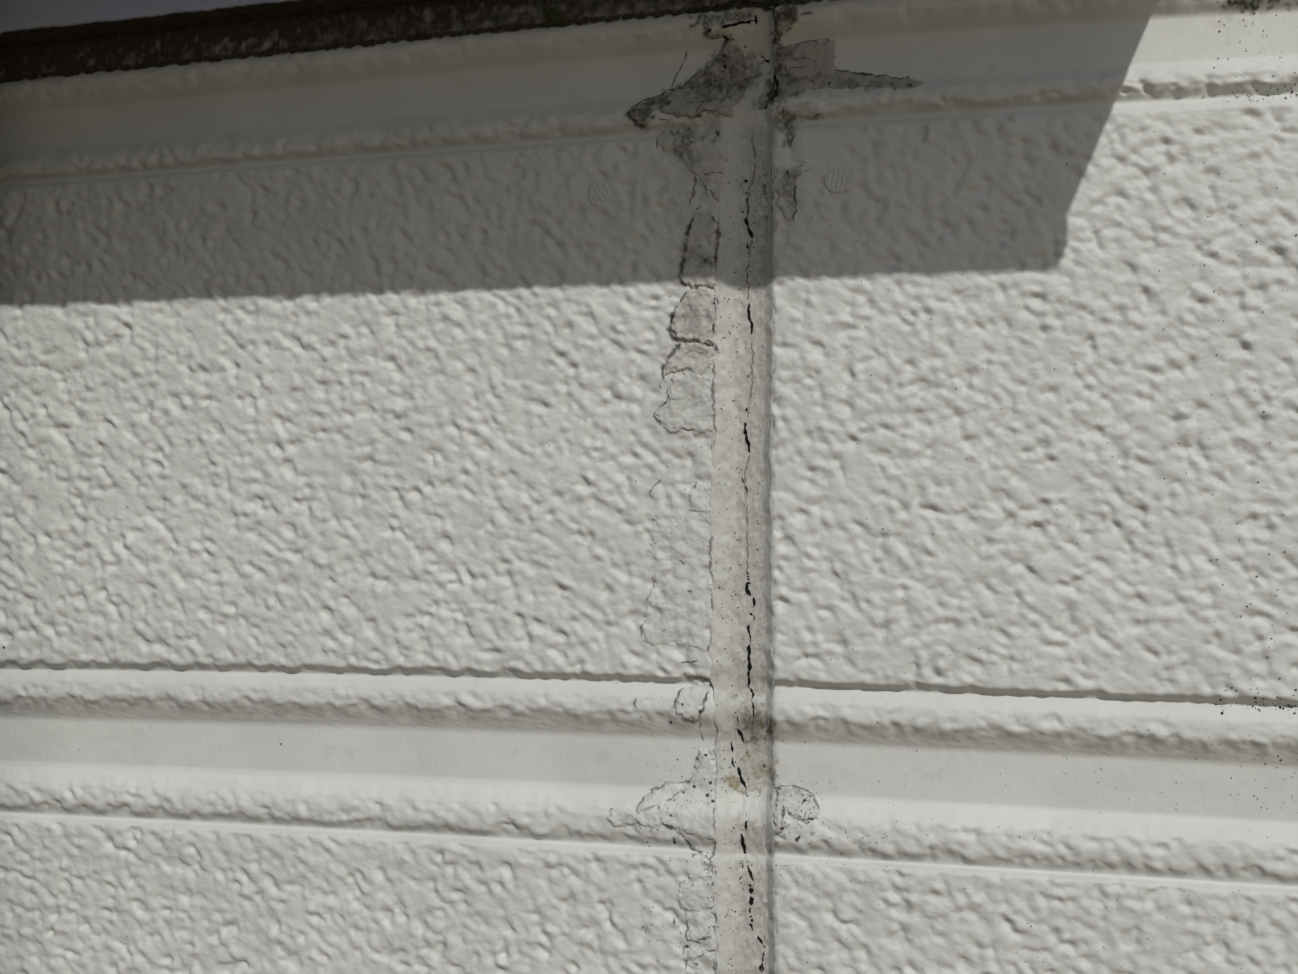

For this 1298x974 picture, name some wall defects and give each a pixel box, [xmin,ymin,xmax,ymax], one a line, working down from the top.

water stain [0,0,822,83]
peeling [642,481,716,651]
crack [731,141,766,973]
peeling [675,869,718,974]